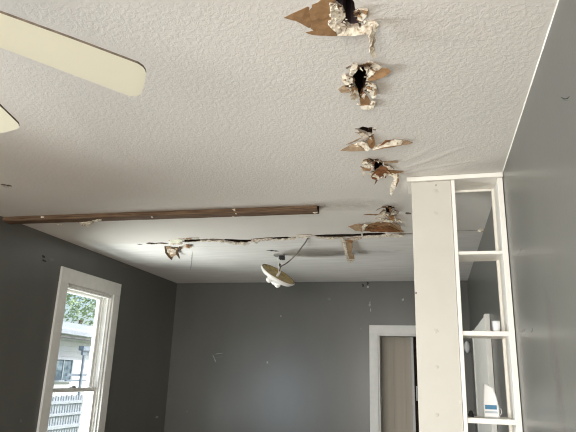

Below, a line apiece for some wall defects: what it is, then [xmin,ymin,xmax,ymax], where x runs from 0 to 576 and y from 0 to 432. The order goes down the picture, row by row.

flaking render [328,0,376,36]
spalling [341,61,383,110]
spalling [354,127,375,151]
spalling [362,158,396,180]
flaking render [378,206,400,223]
crack [138,233,412,270]